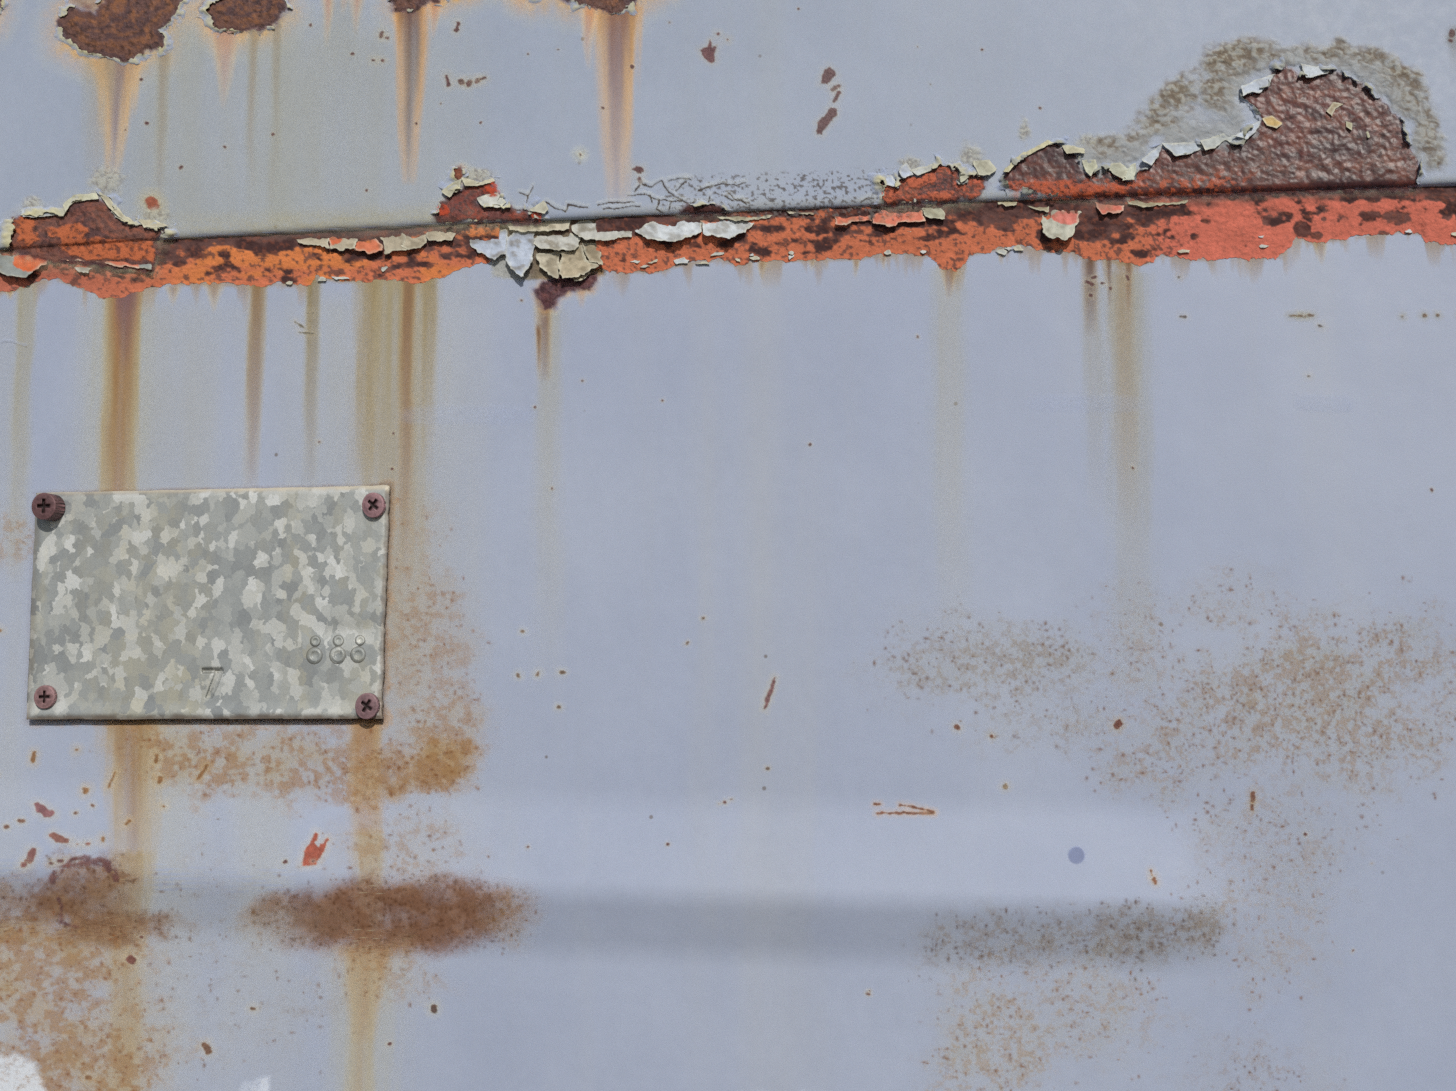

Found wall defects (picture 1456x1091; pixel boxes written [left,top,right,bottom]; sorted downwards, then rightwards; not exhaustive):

corrosion [55,0,293,120]
corrosion [561,0,638,99]
spalling [143,195,161,212]
peeling [467,219,632,281]
spalling [662,172,909,220]
corrosion [520,57,1456,343]
corrosion [0,166,549,522]
corrosion [107,691,477,831]
corrosion [1158,639,1433,772]
corrosion [0,855,168,1091]
corrosion [251,833,527,996]